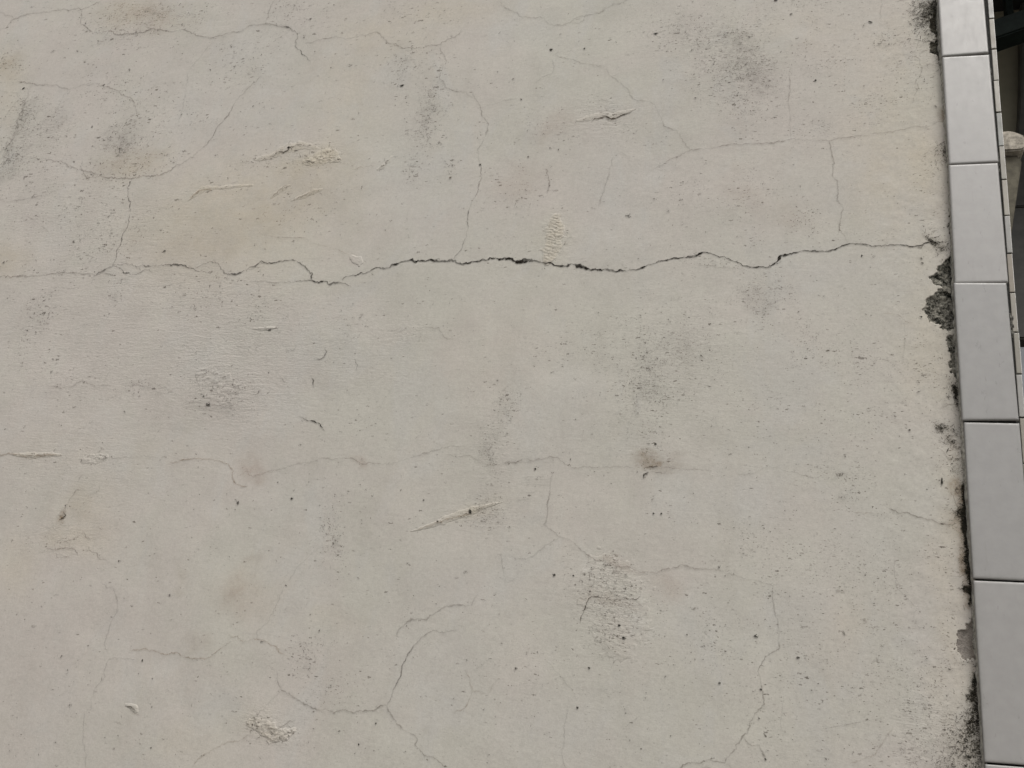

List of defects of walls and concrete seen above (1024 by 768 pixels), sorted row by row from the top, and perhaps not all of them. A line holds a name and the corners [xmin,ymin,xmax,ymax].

mould [897,0,941,71]
crack [96,241,939,285]
flaking render [920,256,957,378]
mould [933,423,974,649]
peeling [246,717,297,745]
mould [916,660,982,768]